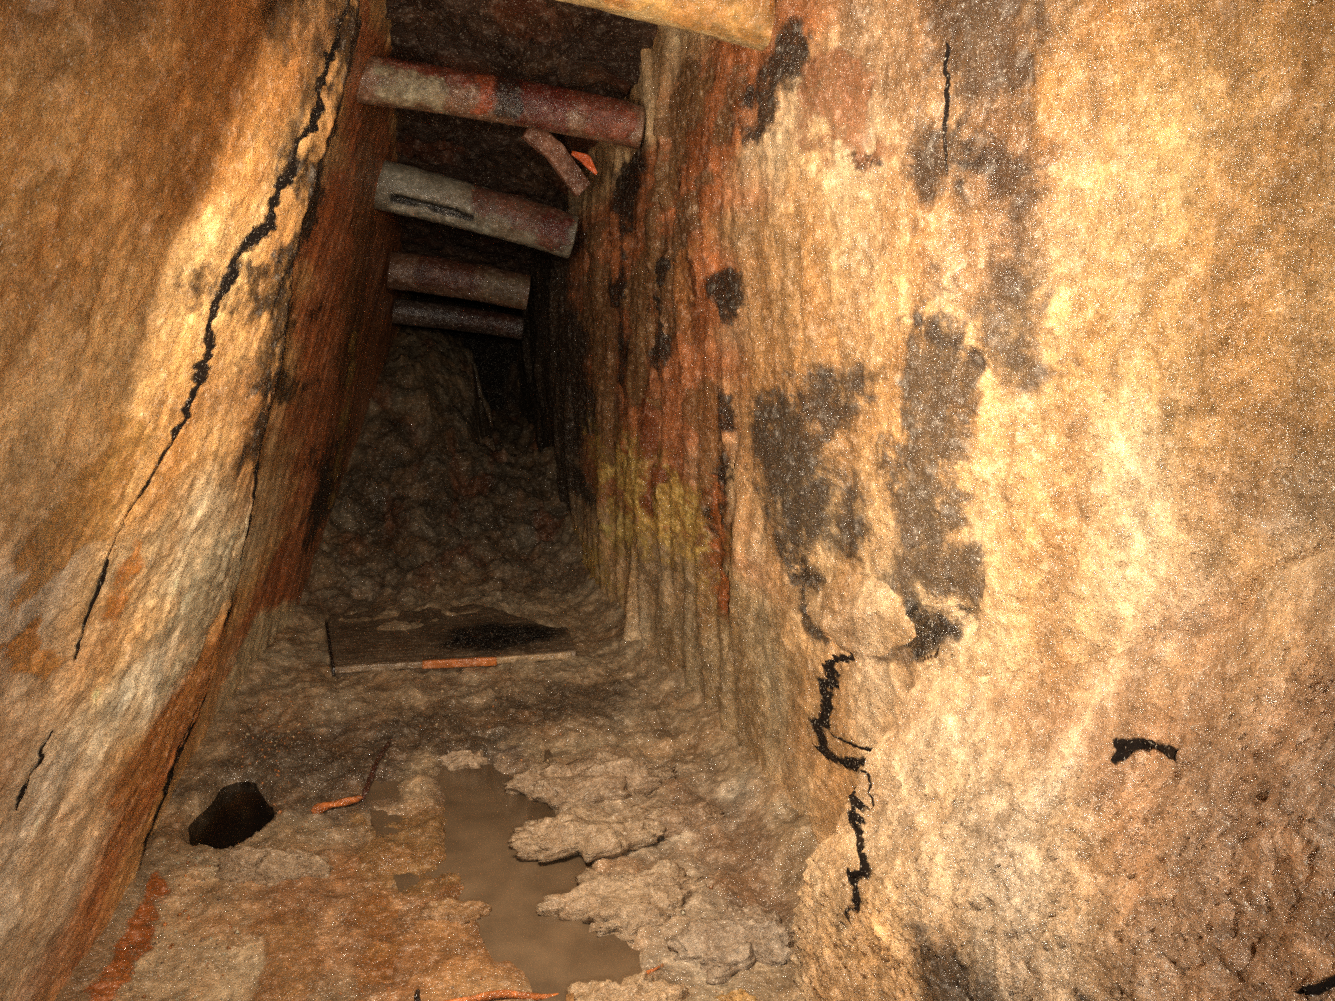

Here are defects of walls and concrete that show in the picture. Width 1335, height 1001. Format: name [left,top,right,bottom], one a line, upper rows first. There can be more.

damp [732,18,812,145]
damp [852,151,882,169]
crack [74,0,350,660]
damp [879,0,1052,611]
crack [139,348,284,871]
damp [750,363,875,643]
crack [808,651,874,922]
rust [85,872,171,1001]
damp [912,924,998,1001]